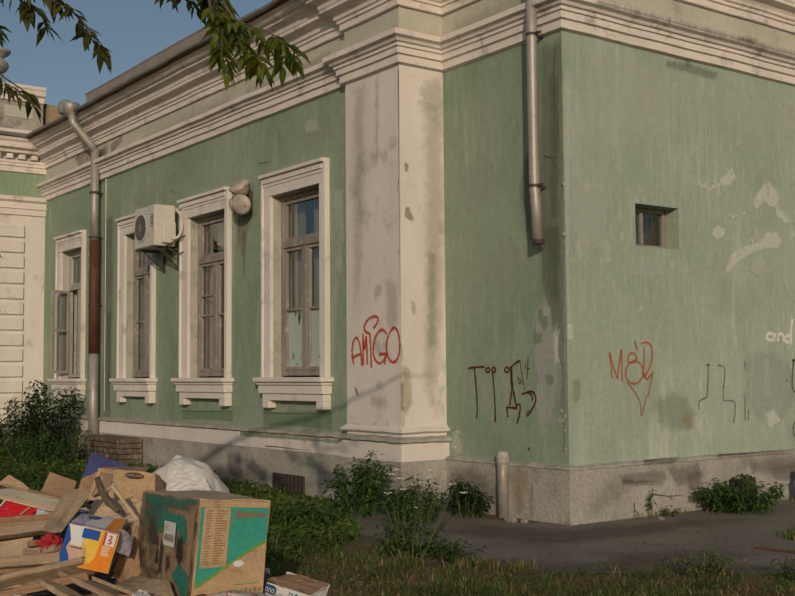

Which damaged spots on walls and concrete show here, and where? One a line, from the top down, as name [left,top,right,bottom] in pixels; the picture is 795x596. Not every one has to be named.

peeling [753,181,789,224]
peeling [533,69,574,454]
peeling [726,230,781,275]